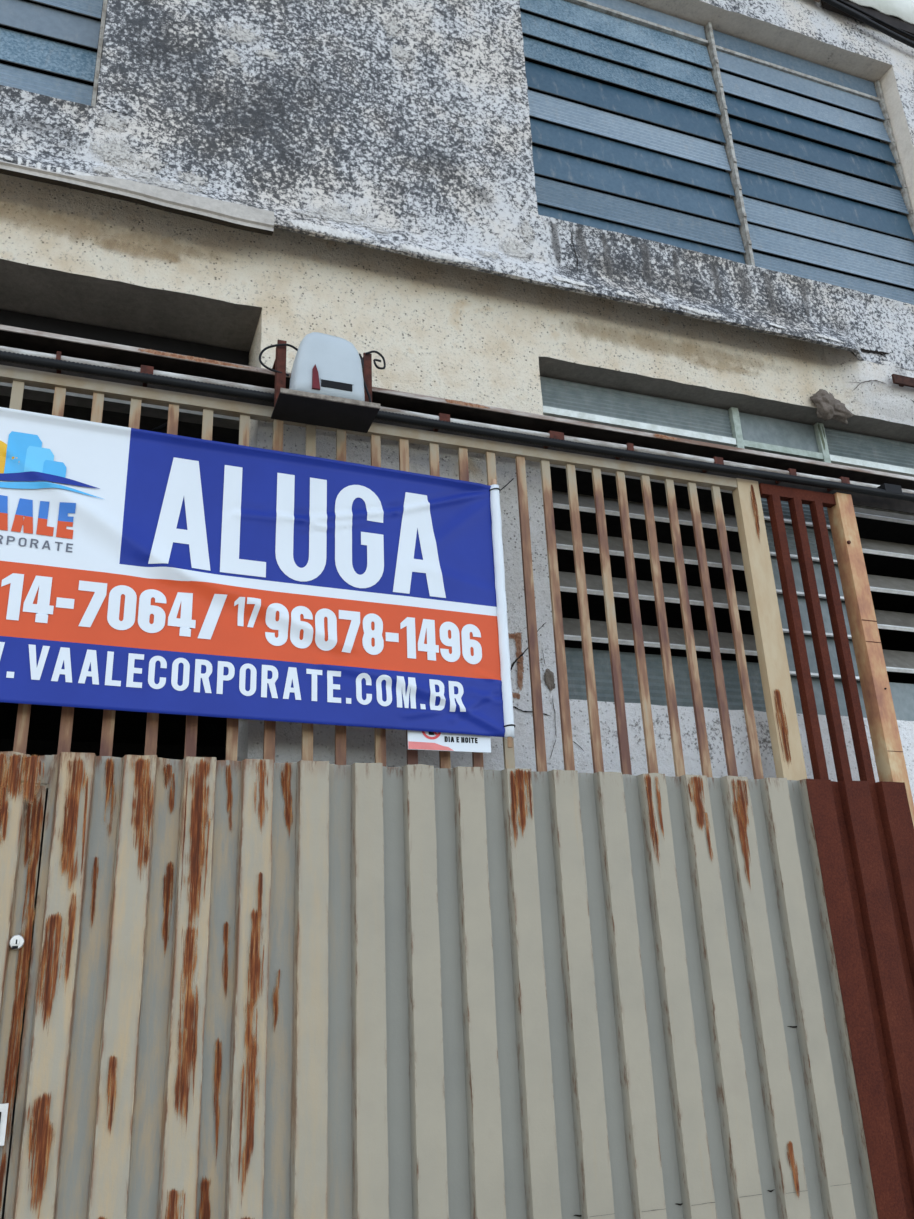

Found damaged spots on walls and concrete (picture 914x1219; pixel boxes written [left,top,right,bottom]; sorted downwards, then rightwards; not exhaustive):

damp [288,219,374,242]
damp [400,243,480,265]
damp [552,224,595,288]
damp [602,235,661,304]
damp [679,304,721,317]
damp [764,273,787,329]
corrosion [254,760,293,837]
corrosion [688,776,713,861]
corrosion [731,779,751,889]
corrosion [131,758,211,1128]
corrosion [0,753,99,1219]
corrosion [238,872,280,1219]